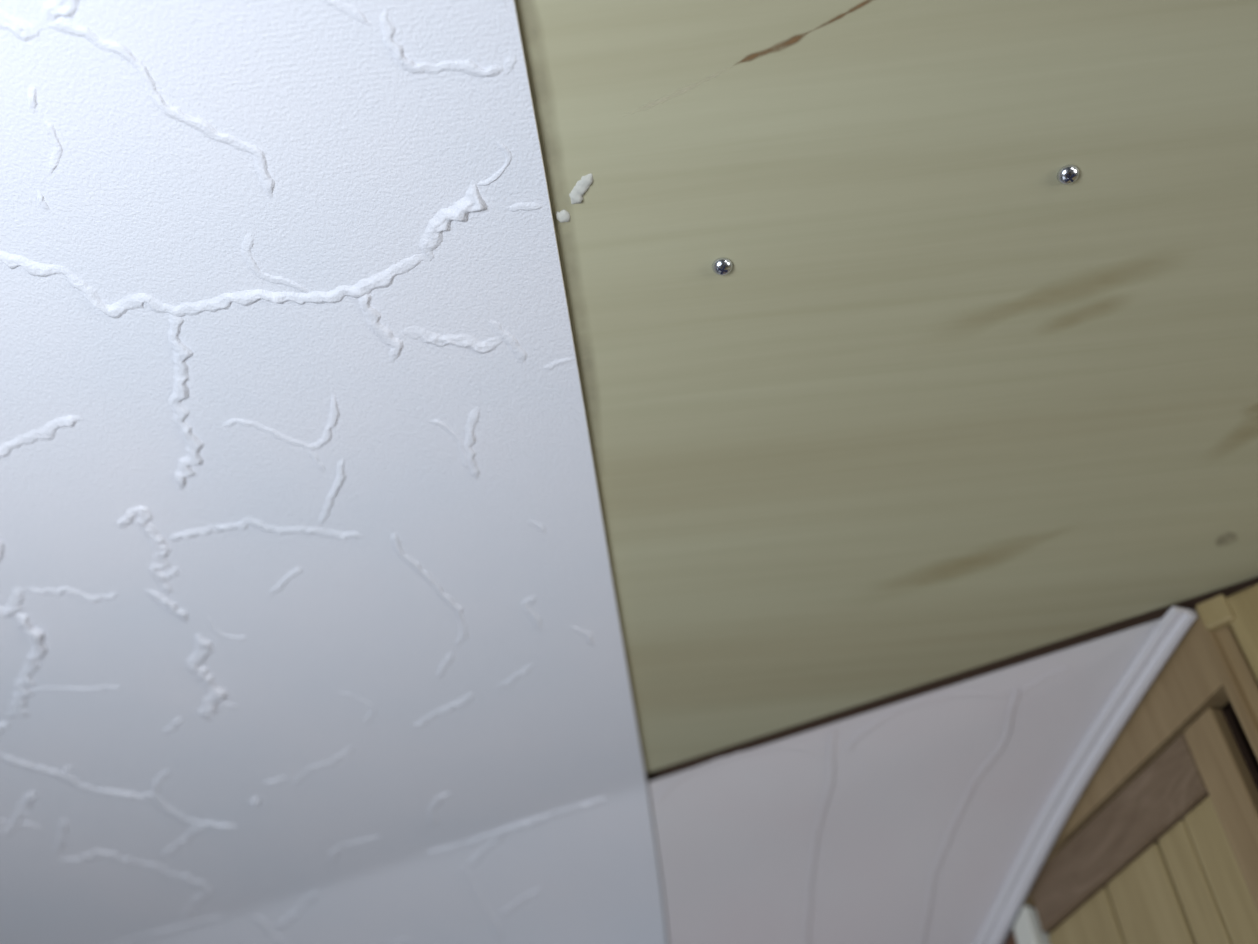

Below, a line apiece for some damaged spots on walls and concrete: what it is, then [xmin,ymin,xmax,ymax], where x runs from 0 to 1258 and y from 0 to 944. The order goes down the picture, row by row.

crack [0,0,275,213]
crack [321,0,517,77]
crack [740,0,871,63]
crack [0,140,575,858]